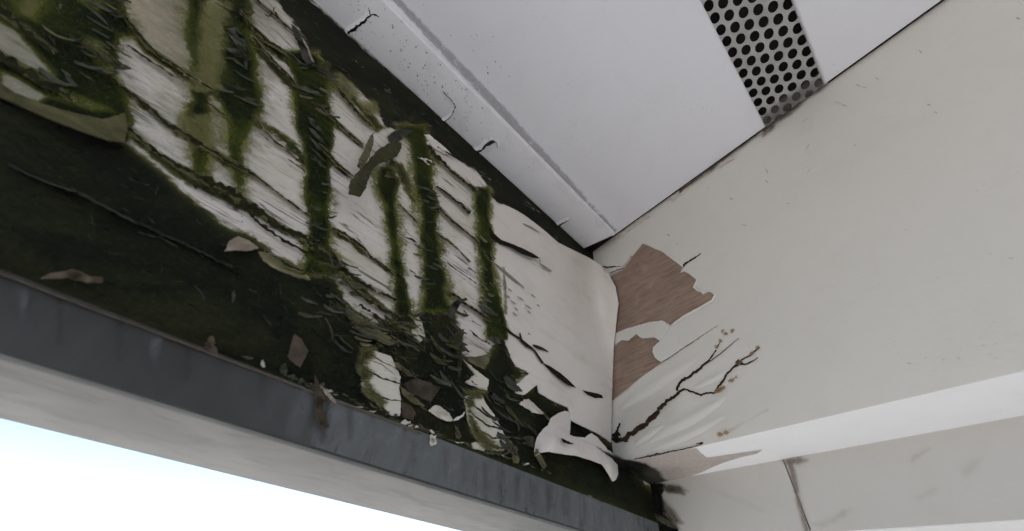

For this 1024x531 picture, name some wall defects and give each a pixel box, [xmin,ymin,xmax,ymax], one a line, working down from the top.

crack [345,8,379,34]
peeling [0,83,128,143]
peeling [224,236,258,252]
peeling [281,333,336,429]
crack [113,79,548,363]
leakage [0,98,685,531]
peeling [298,205,426,348]
peeling [348,129,413,197]
leakage [278,0,594,261]
peeling [420,135,452,165]
peeling [400,204,716,481]
crack [611,325,760,460]